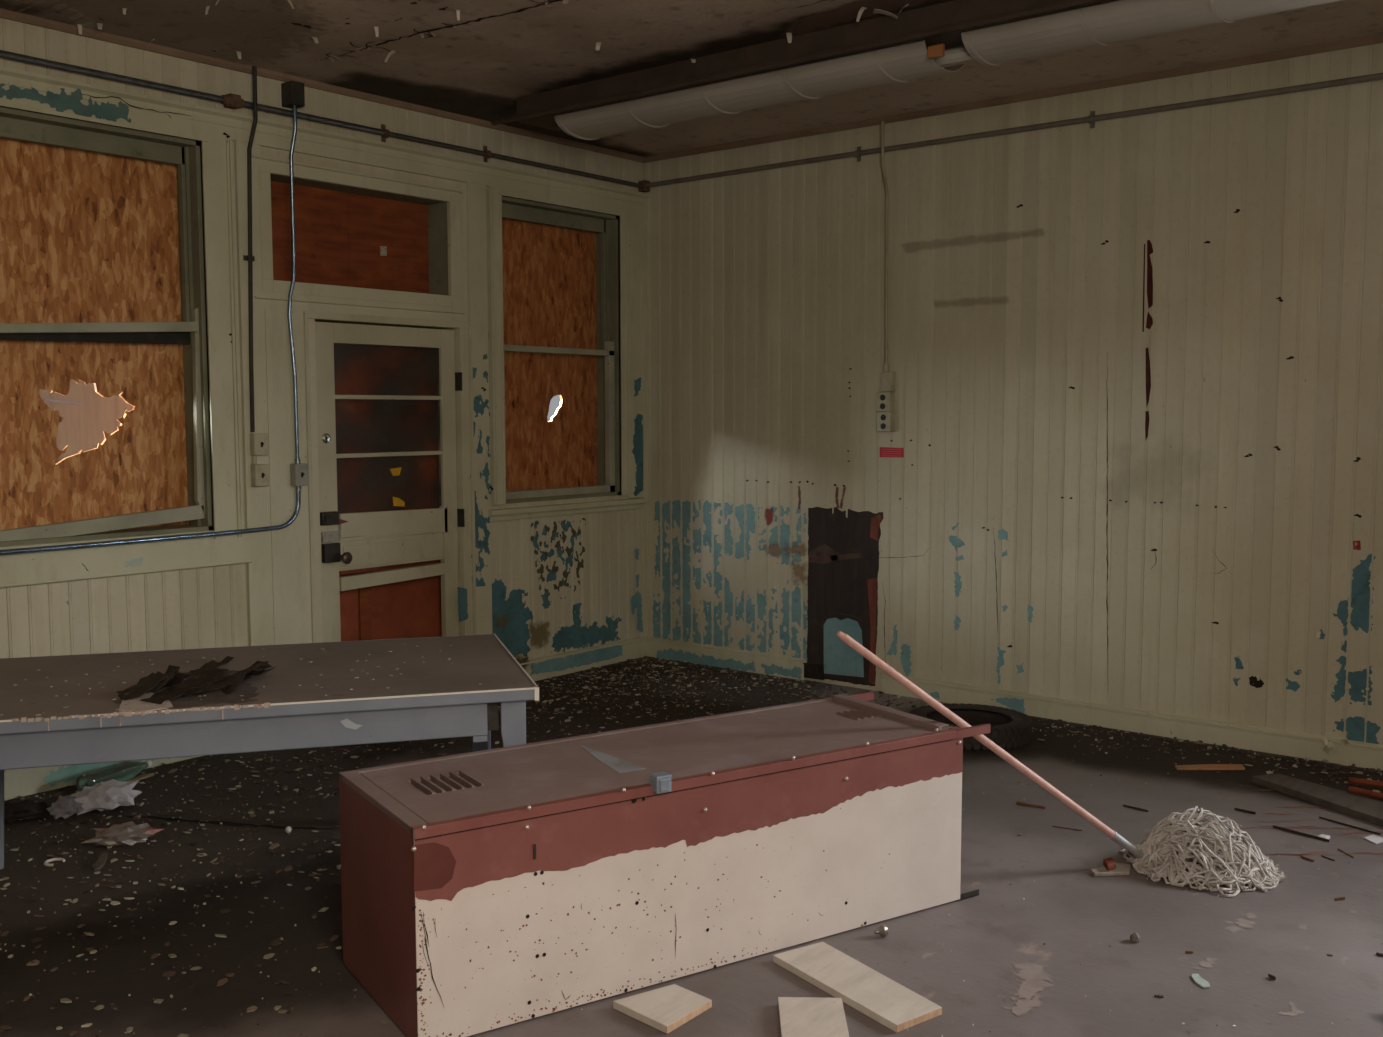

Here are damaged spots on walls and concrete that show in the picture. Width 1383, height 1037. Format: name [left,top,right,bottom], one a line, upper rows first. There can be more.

crack [317,0,578,62]
peeling [0,83,131,124]
peeling [458,354,808,679]
peeling [1316,554,1380,766]
peeling [43,758,170,787]